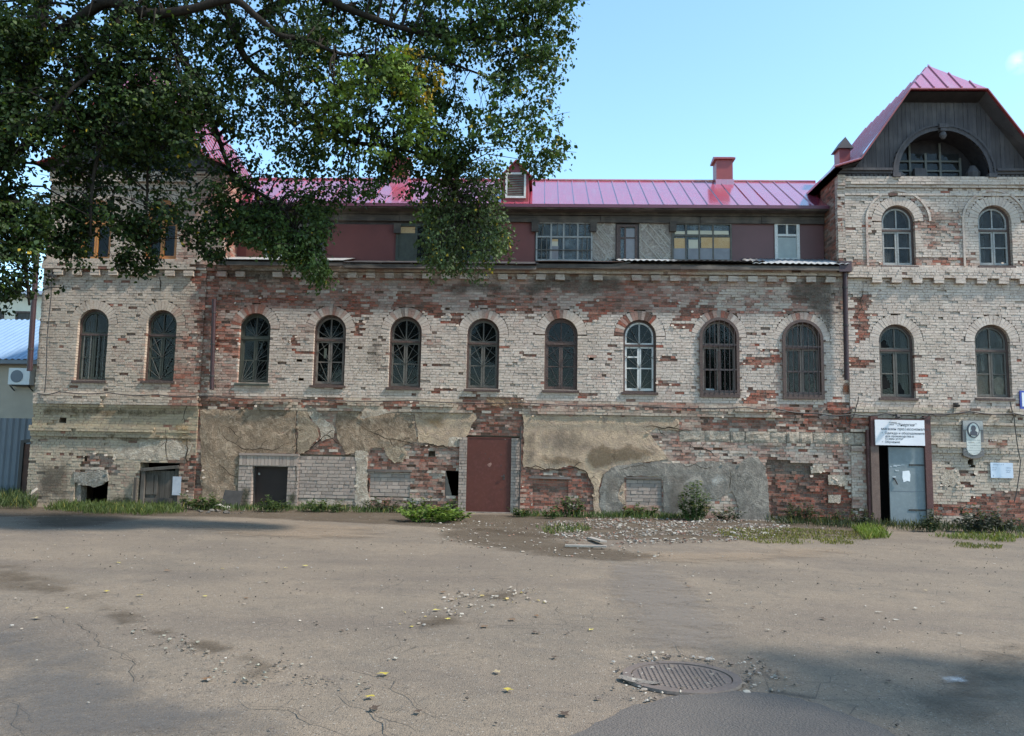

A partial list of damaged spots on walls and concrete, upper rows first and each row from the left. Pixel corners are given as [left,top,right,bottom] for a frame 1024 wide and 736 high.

flaking render [78,262,869,524]
crack [219,408,339,496]
crack [357,423,457,453]
leakage [546,445,652,467]